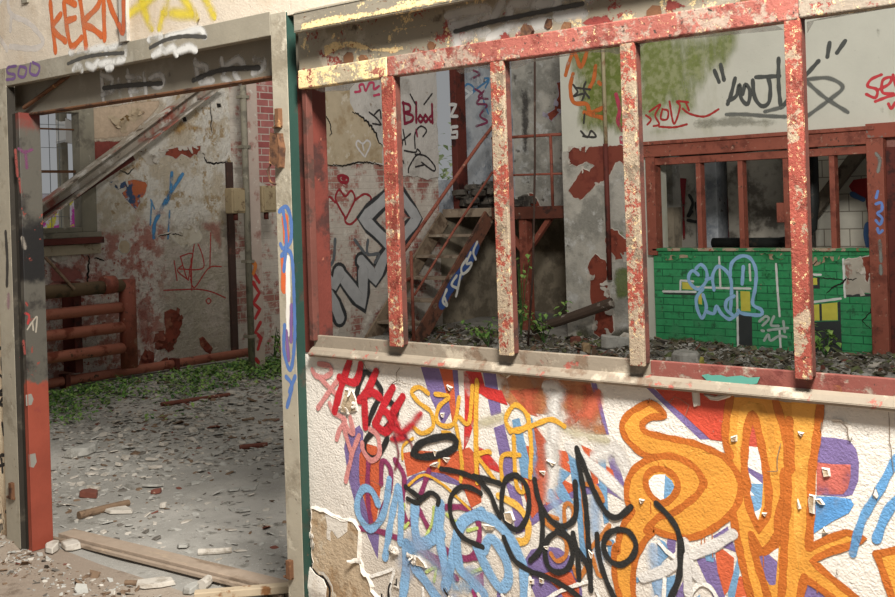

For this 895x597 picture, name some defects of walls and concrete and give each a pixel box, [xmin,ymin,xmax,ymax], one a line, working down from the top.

peeling [665,0,685,12]
peeling [568,144,624,201]
peeling [587,228,627,337]
peeling [139,307,183,370]
peeling [199,336,213,354]
crack [311,565,333,597]
flaking render [308,506,381,597]
peeling [388,544,428,568]